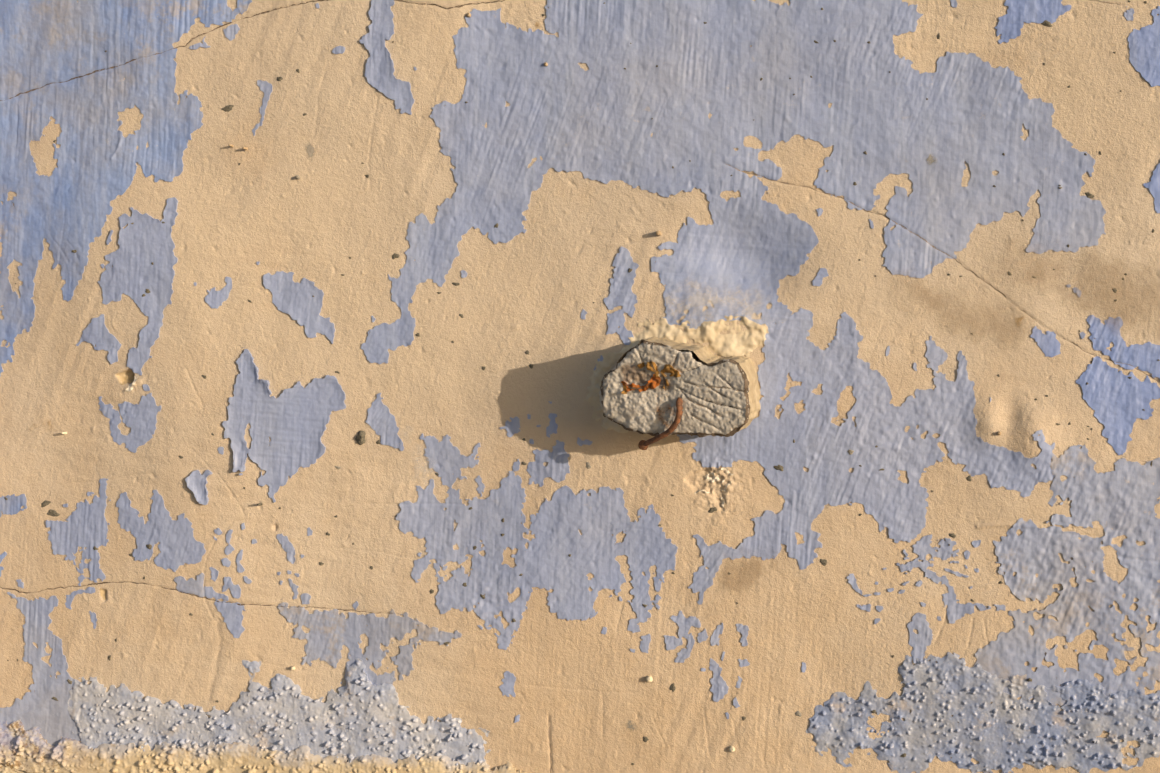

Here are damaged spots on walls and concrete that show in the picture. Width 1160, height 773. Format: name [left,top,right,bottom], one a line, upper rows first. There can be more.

crack [0,0,329,101]
crack [396,0,505,9]
peeling [0,0,252,453]
crack [726,164,1031,317]
peeling [256,261,335,344]
peeling [218,347,346,502]
corrosion [621,361,681,394]
peeling [276,0,1160,719]
crack [1055,333,1160,384]
peeling [185,470,213,505]
peeling [0,478,257,746]
crack [1,582,393,614]